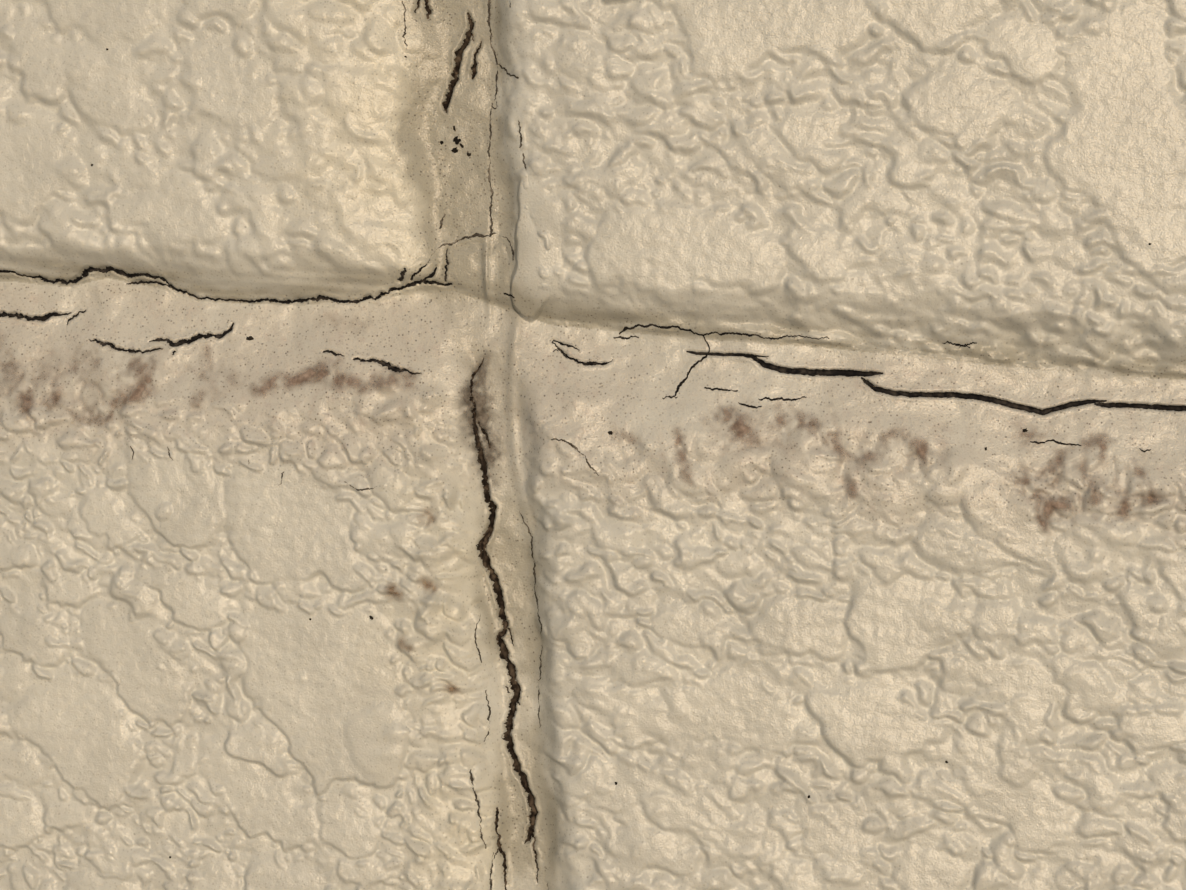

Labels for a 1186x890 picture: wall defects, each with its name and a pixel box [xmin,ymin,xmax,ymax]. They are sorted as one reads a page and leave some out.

crack [0,0,526,355]
crack [305,350,421,375]
crack [552,324,1186,446]
crack [469,358,549,890]